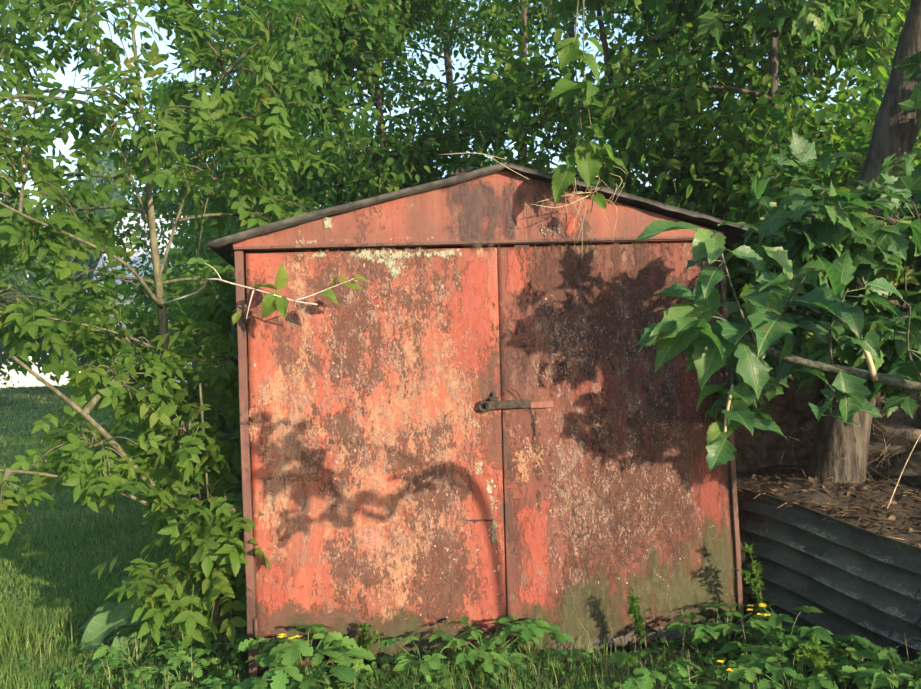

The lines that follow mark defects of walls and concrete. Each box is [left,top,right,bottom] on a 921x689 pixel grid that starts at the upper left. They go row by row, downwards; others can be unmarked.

rust [261,246,488,631]
rust [531,413,543,517]
leakage [444,173,727,615]